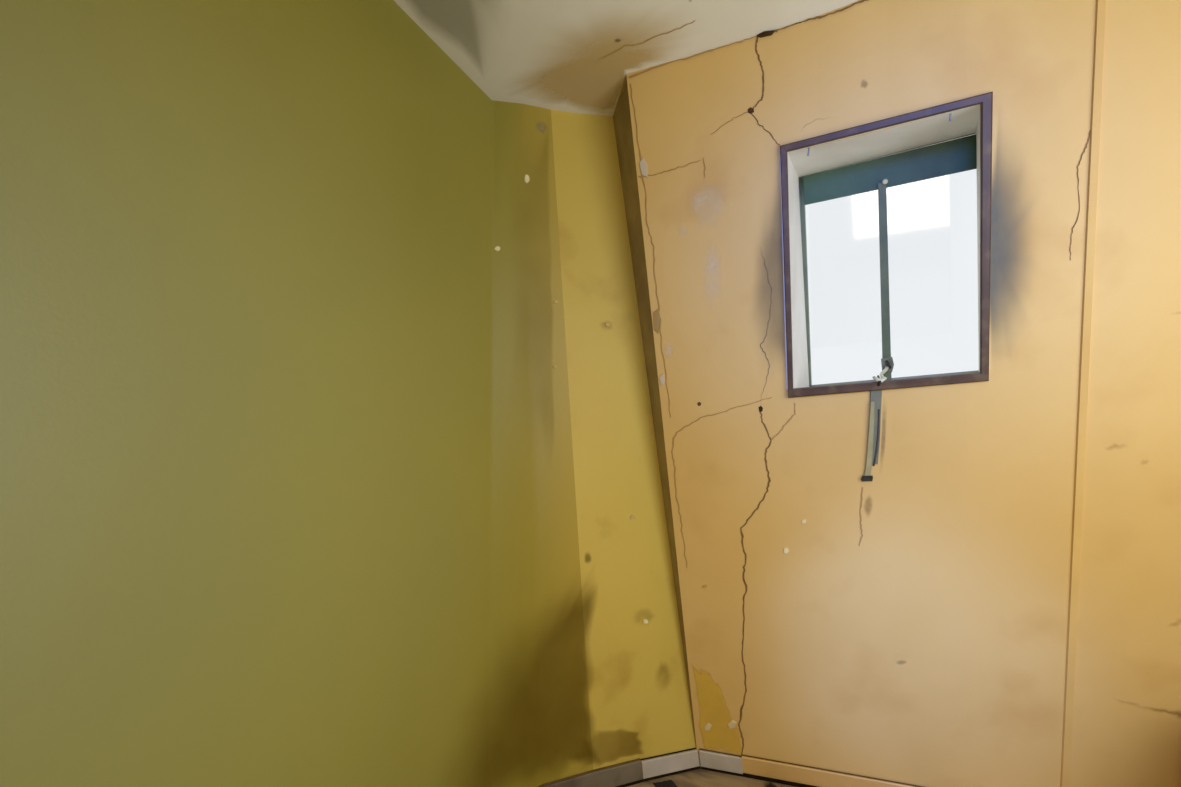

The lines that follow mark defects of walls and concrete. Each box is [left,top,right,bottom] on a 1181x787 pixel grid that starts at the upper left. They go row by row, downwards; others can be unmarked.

damp [543,42,649,109]
crack [1070,130,1091,260]
crack [600,0,867,755]
damp [495,674,587,766]
peeling [694,669,741,754]